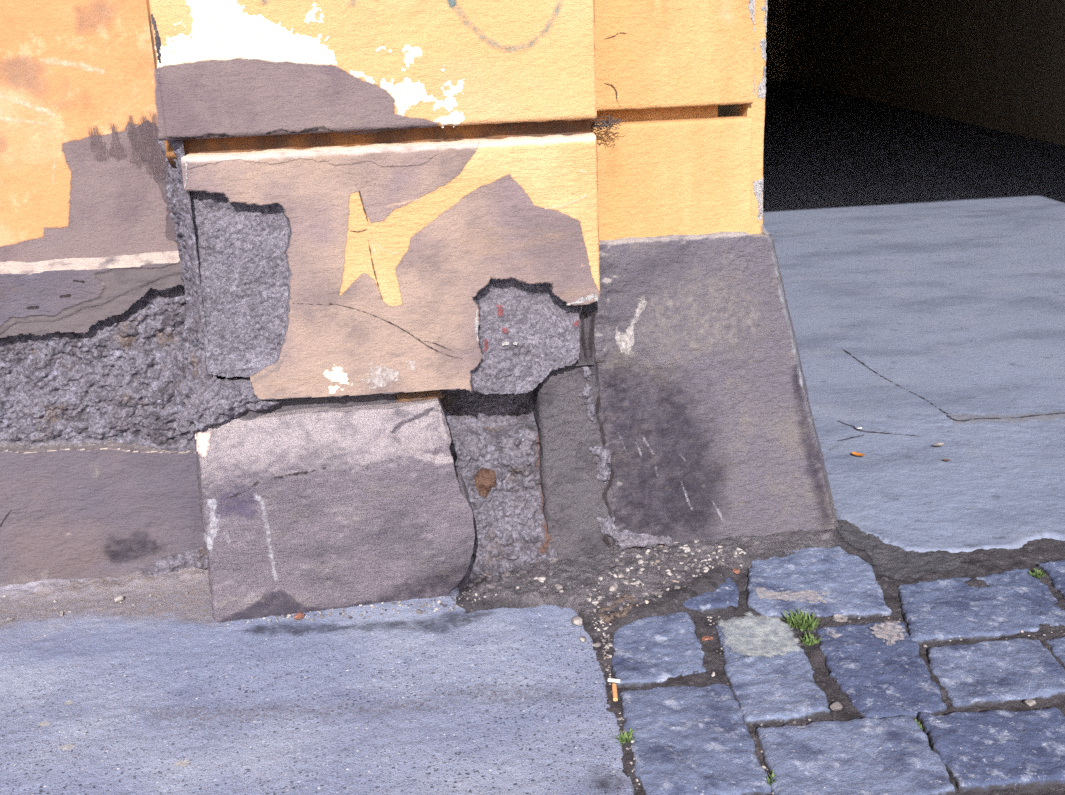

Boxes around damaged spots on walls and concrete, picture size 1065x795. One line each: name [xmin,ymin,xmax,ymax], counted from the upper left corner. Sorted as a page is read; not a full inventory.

peeling [151,0,338,74]
peeling [266,44,465,135]
spalling [0,133,437,457]
crack [293,191,462,359]
spalling [470,277,598,395]